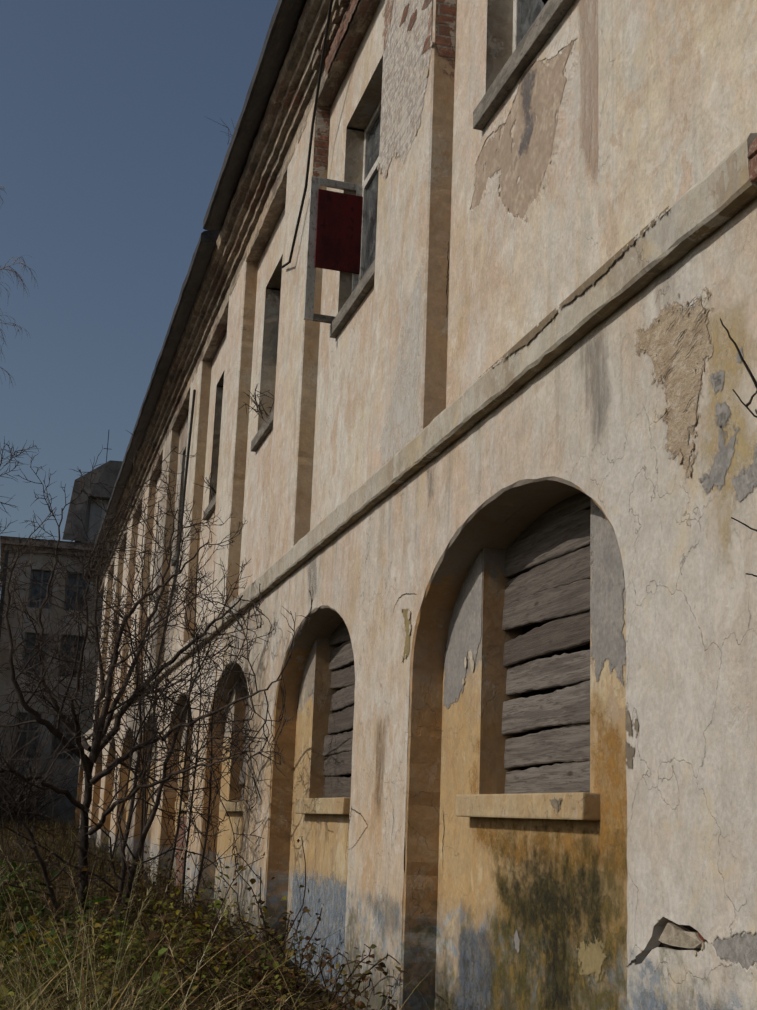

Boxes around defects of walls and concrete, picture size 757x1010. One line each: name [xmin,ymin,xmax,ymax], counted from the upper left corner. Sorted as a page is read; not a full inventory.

flaking render [313,108,330,178]
flaking render [312,0,358,73]
peeling [377,0,456,180]
peeling [466,25,582,235]
flaking render [747,137,757,183]
flaking render [634,288,757,502]
peeling [443,550,483,709]
damp [477,710,627,1010]
flaking render [706,916,757,982]